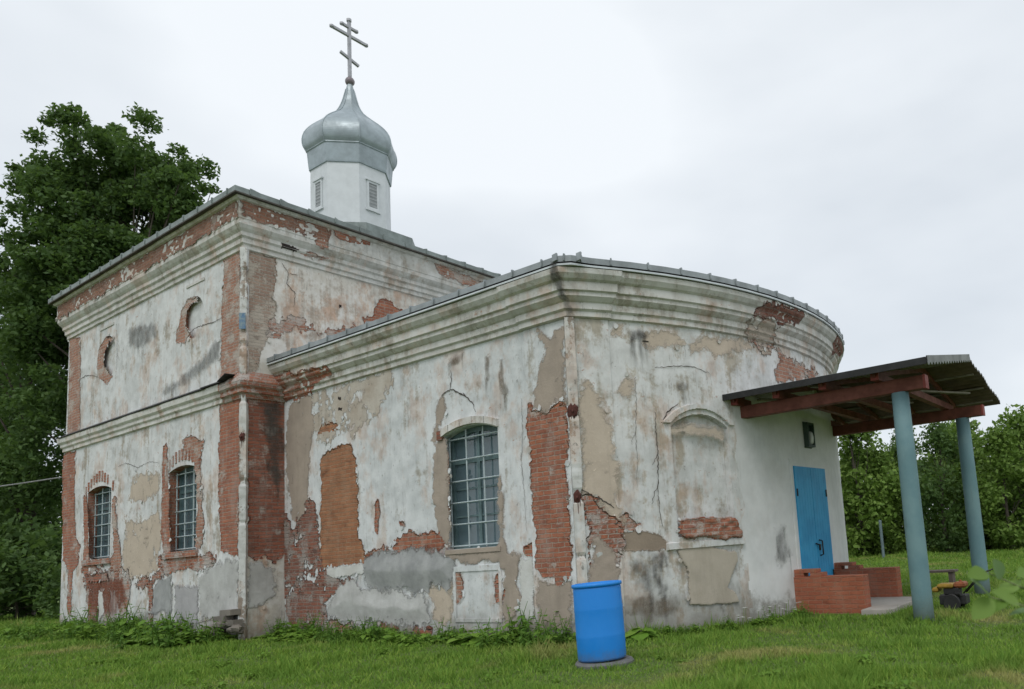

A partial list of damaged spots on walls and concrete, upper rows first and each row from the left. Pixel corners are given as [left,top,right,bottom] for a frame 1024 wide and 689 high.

spalling [175,296,198,346]
spalling [61,370,452,633]
crack [442,370,476,412]
spalling [523,326,667,631]
crack [635,384,678,526]
spalling [642,326,819,383]